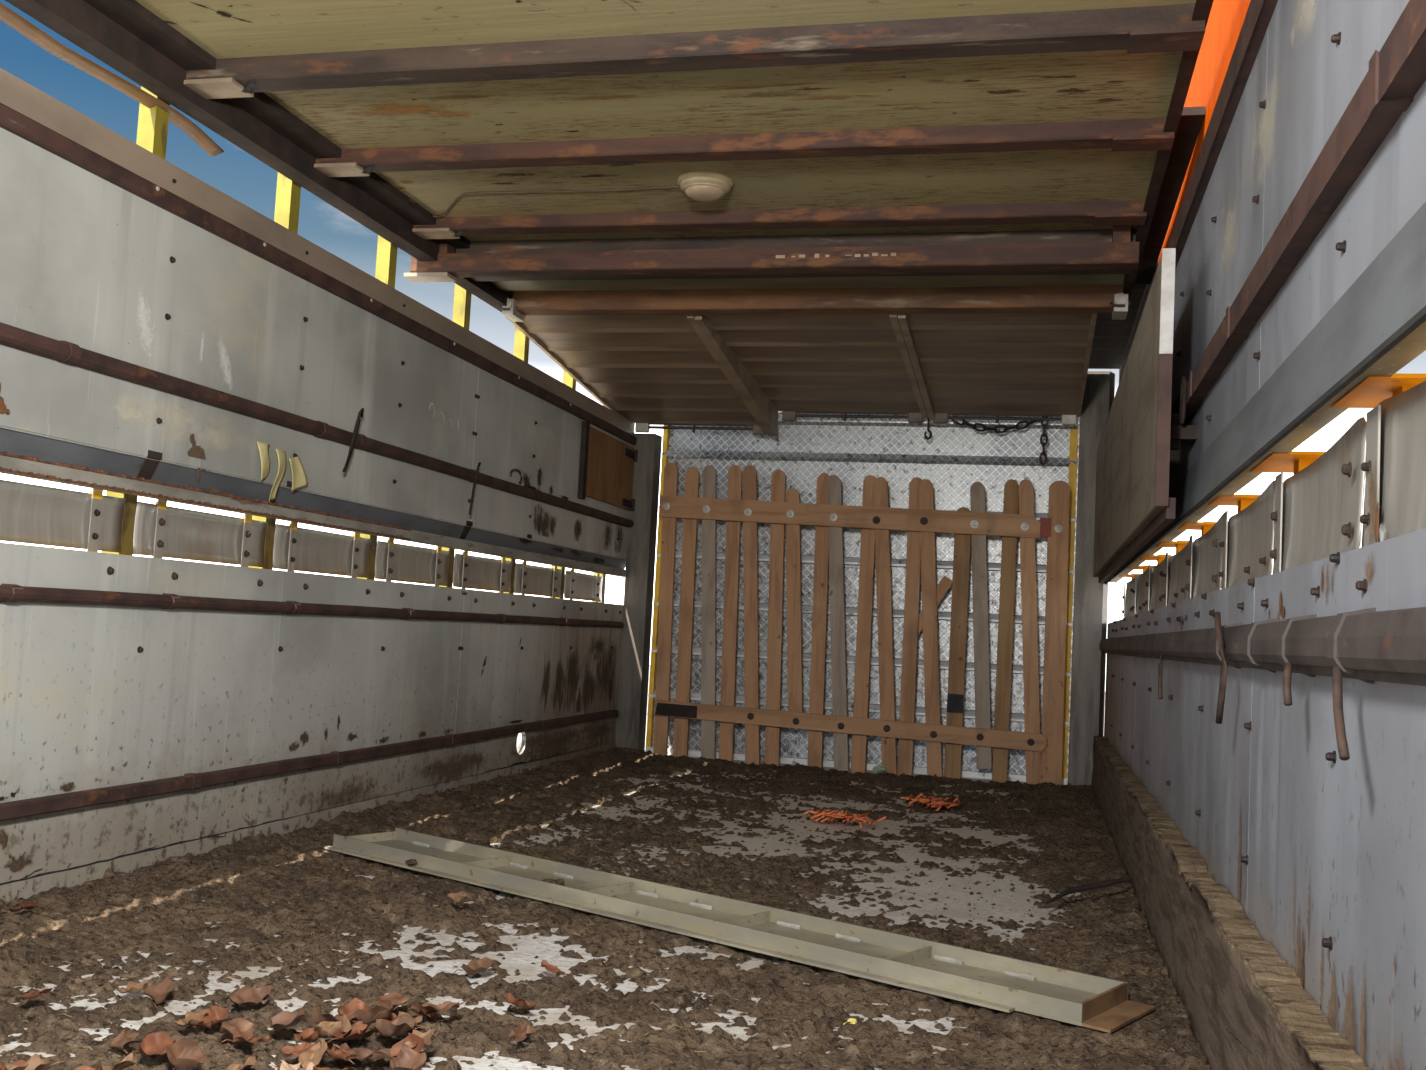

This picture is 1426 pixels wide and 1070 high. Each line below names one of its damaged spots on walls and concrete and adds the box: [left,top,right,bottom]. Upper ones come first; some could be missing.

leakage [540,639,616,713]
leakage [518,723,609,758]
leakage [424,754,482,782]